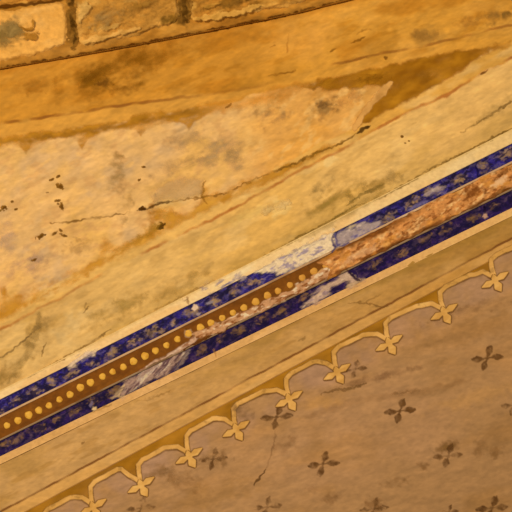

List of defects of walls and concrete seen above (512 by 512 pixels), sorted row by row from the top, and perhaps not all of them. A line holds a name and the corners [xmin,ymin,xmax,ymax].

crack [276,126,370,172]
crack [387,130,508,193]
crack [289,189,374,243]
peeling [113,164,512,398]